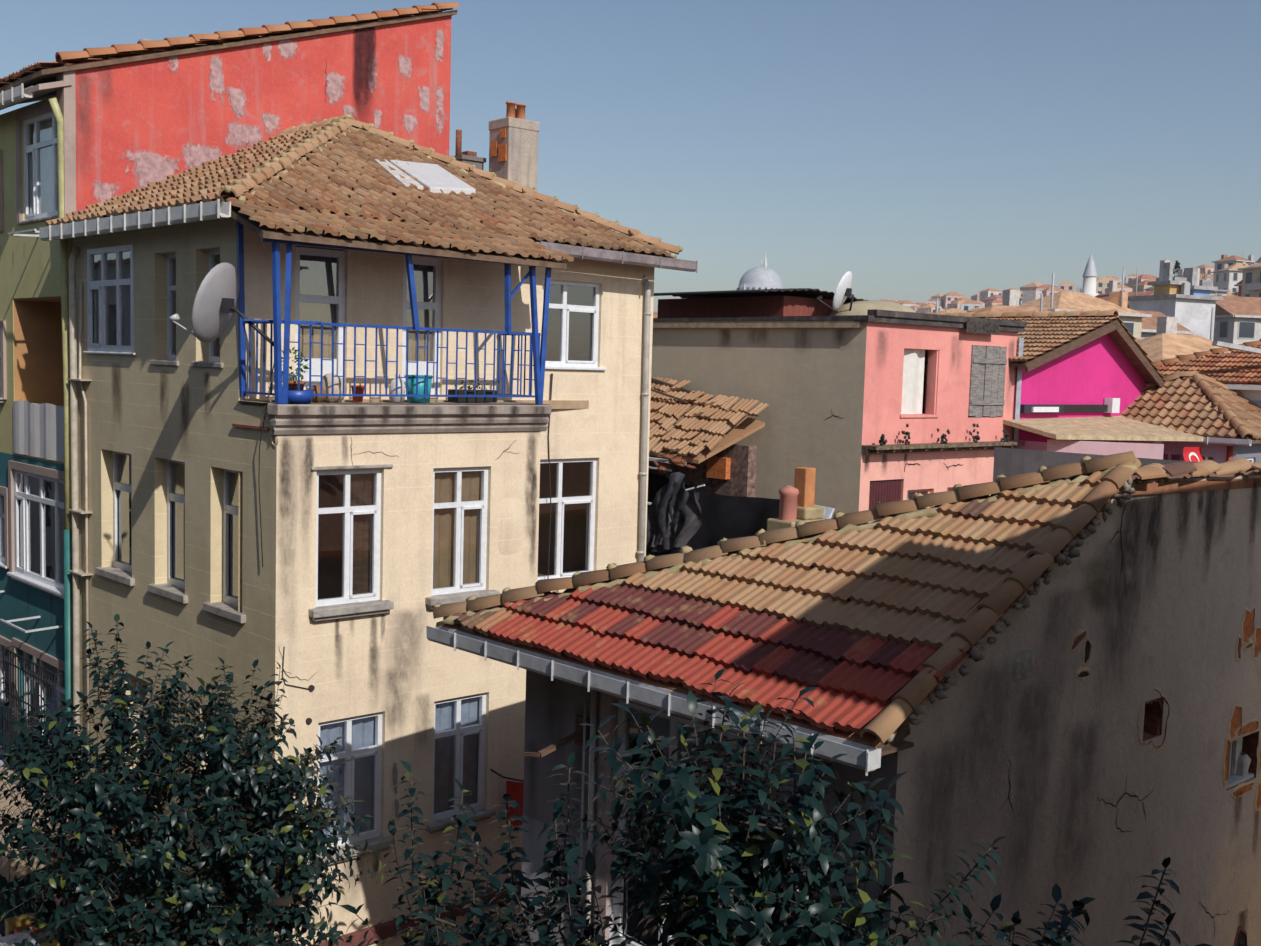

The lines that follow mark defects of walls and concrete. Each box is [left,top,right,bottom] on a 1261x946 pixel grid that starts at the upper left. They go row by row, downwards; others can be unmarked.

peeling [263,39,299,62]
peeling [435,29,444,62]
peeling [92,56,282,202]
peeling [326,72,356,116]
peeling [373,109,382,128]
peeling [398,54,445,137]
flaking render [1068,627,1093,682]
flaking render [1235,605,1261,662]
flaking render [1222,703,1261,813]
crack [1098,775,1154,832]